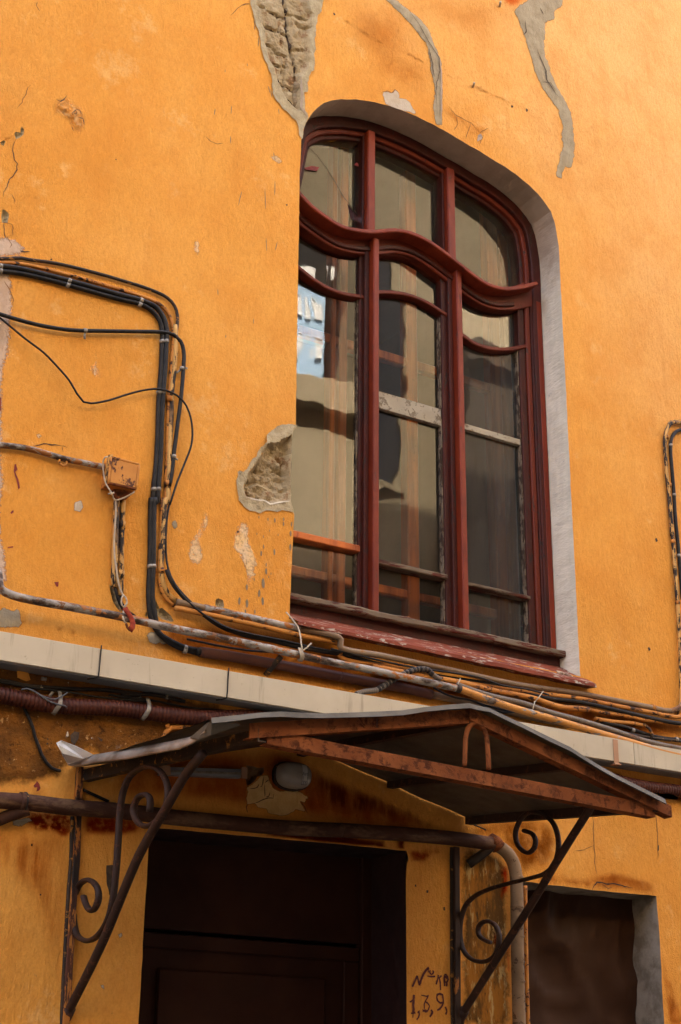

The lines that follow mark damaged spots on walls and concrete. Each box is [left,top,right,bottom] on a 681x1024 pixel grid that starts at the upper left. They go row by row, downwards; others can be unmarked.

flaking render [250,0,323,139]
peeling [383,90,416,114]
peeling [0,274,14,442]
flaking render [236,424,297,513]
peeling [189,517,208,564]
peeling [235,523,257,577]
peeling [0,608,22,627]
peeling [246,765,308,816]
rust [30,814,70,835]
rust [87,817,136,832]